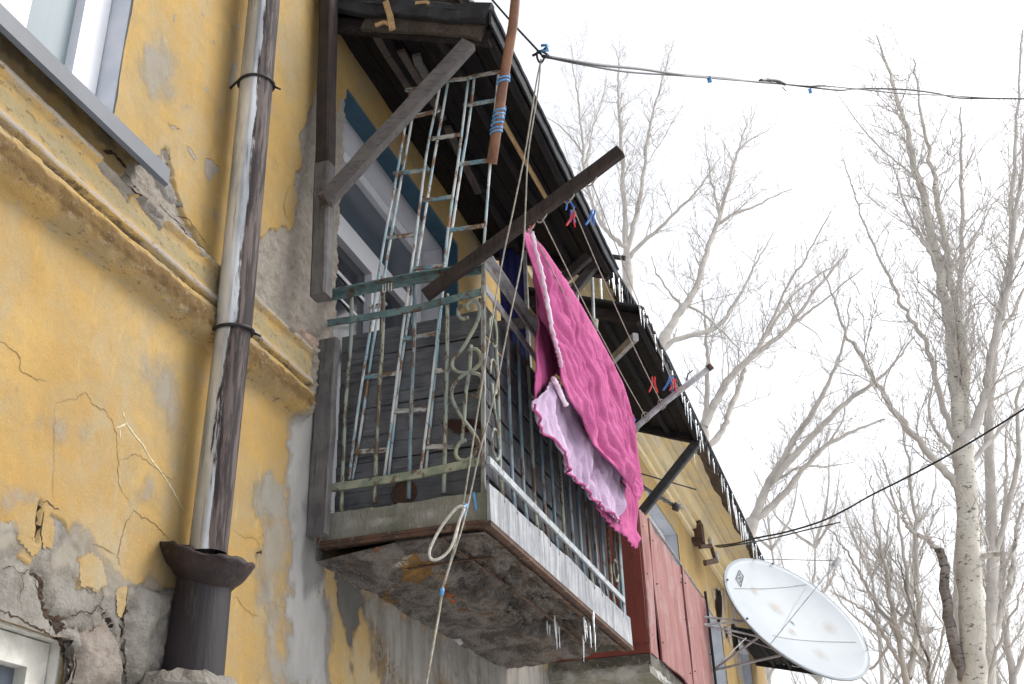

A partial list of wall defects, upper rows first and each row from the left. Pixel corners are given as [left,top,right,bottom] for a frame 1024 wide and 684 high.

flaking render [335,97,345,176]
flaking render [97,147,221,268]
flaking render [255,91,341,394]
crack [34,392,171,564]
corrosion [442,419,481,433]
flaking render [0,511,142,684]
corrosion [399,553,467,611]